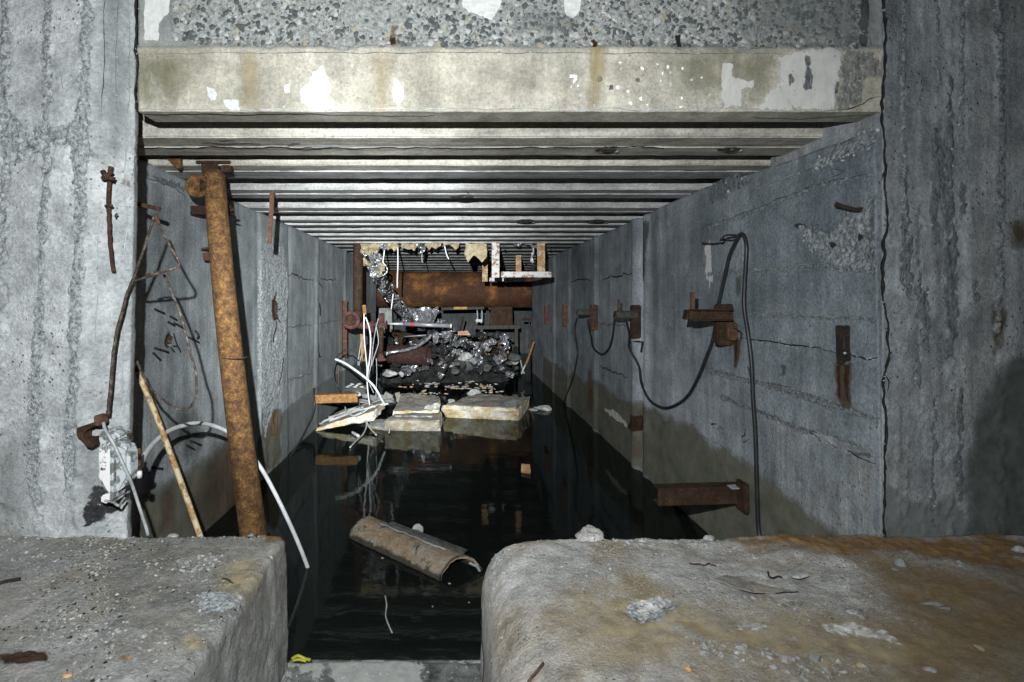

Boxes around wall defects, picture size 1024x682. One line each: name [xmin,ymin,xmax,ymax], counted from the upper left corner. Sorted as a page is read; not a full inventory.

spalling [144,0,881,112]
crack [700,0,891,538]
spalling [794,193,877,275]
rust [835,364,850,408]
water stain [83,447,227,538]